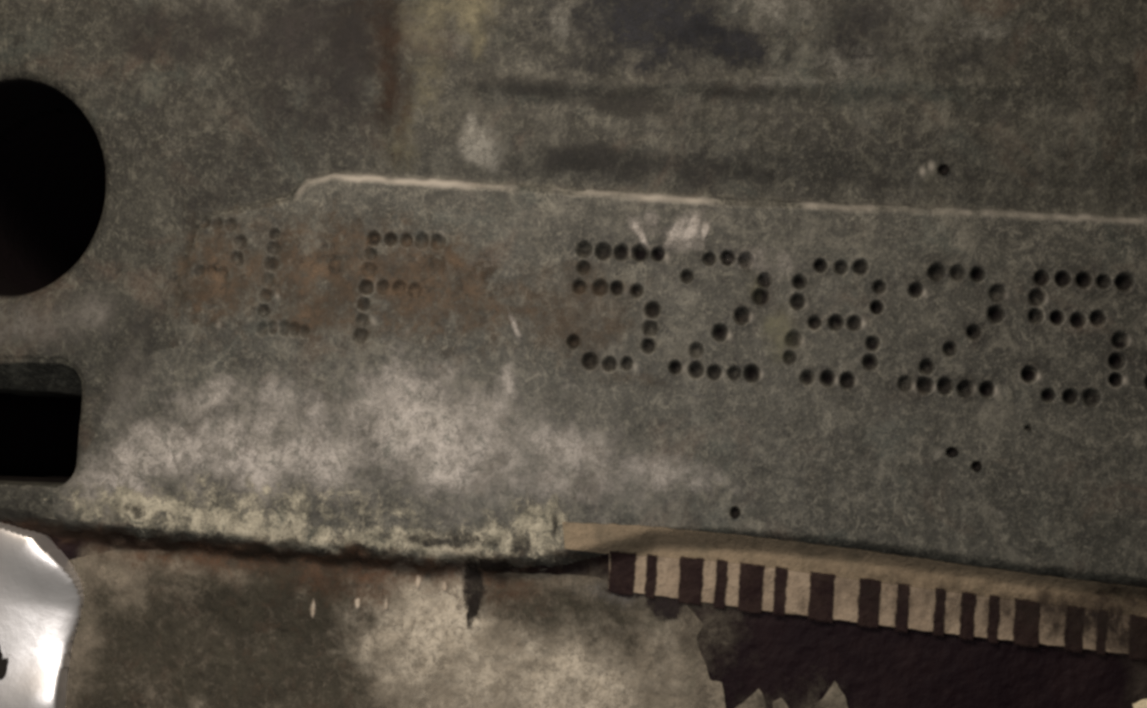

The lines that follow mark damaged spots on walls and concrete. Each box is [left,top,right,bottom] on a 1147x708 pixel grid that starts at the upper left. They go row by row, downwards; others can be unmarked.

damp [89,372,598,516]